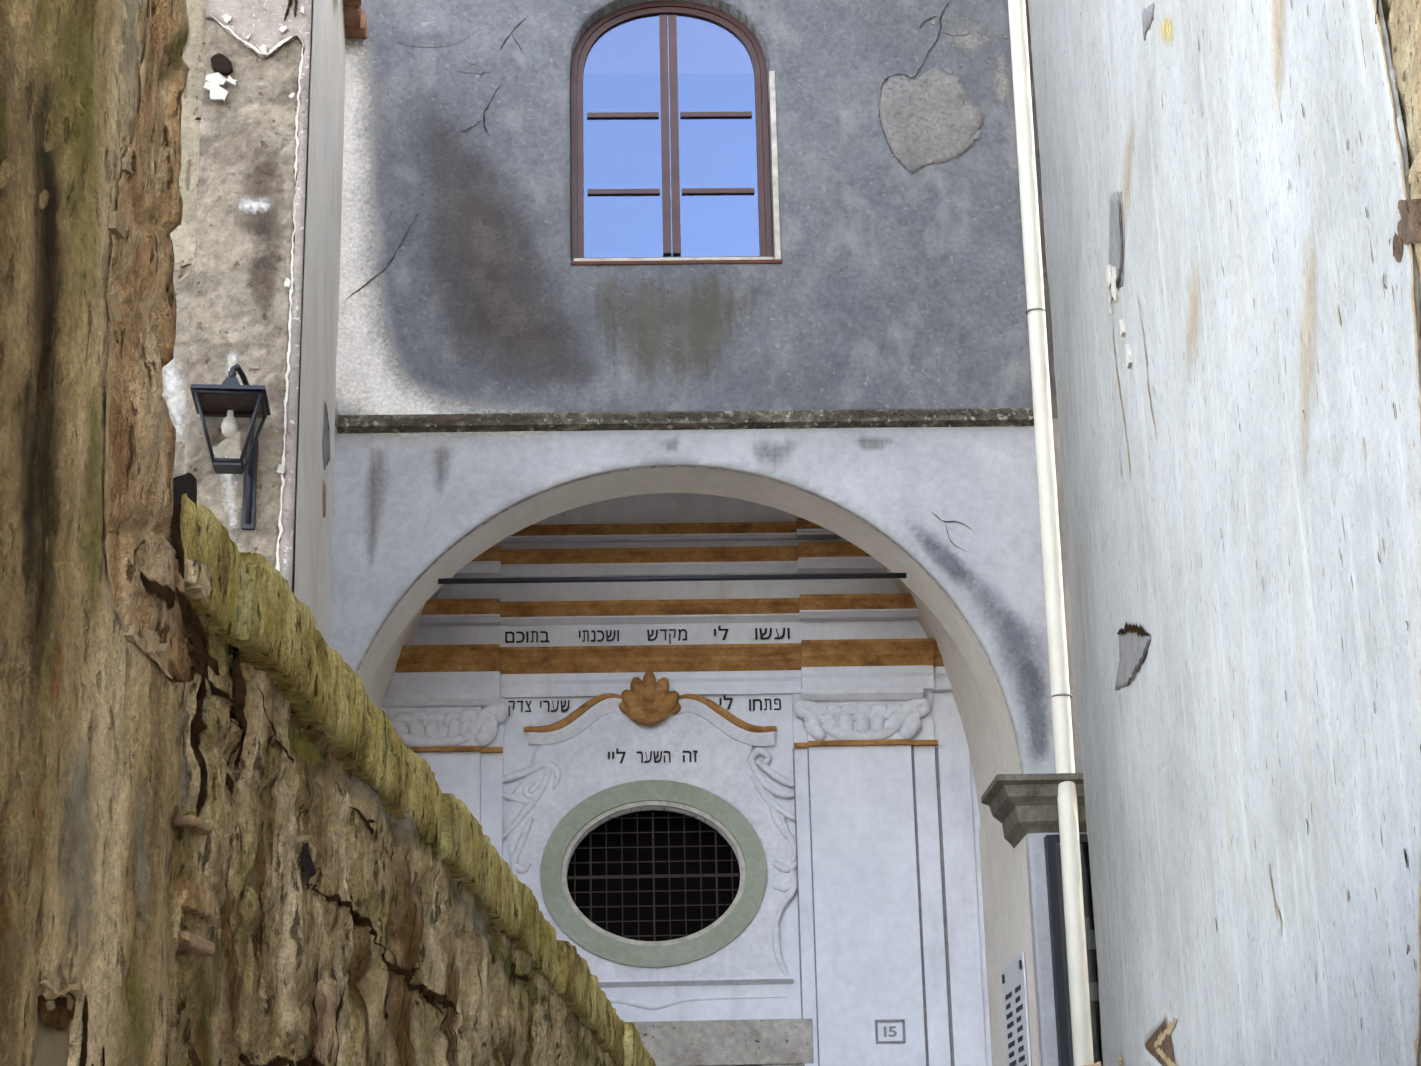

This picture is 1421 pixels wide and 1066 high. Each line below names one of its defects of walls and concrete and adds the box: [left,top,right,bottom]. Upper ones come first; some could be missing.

peeling [879,20,1009,173]
water stain [433,132,578,374]
water stain [605,281,733,372]
water stain [924,537,967,578]
crack [140,504,294,817]
water stain [982,591,1045,749]
spalling [1115,622,1151,691]
peeling [37,986,74,1010]
crack [188,1018,201,1066]
crack [239,962,346,1066]
crack [305,877,459,1021]